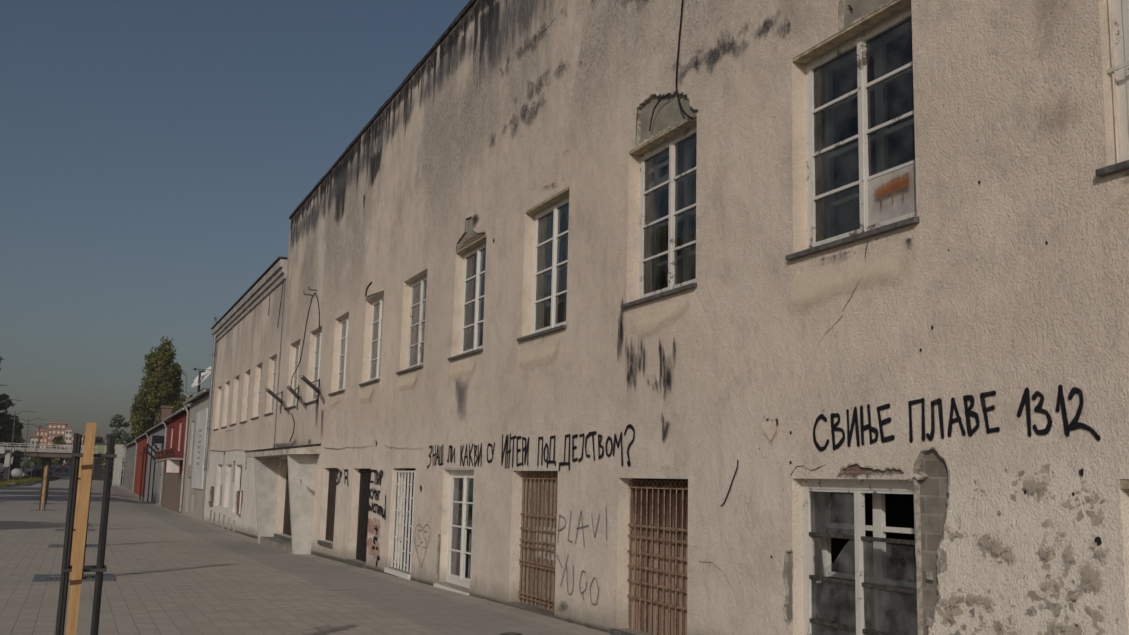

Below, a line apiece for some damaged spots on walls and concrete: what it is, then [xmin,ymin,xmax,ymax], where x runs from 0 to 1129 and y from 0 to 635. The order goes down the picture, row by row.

leakage [290,0,545,246]
flaking render [635,90,699,146]
leakage [617,300,685,396]
flaking render [837,446,1119,635]